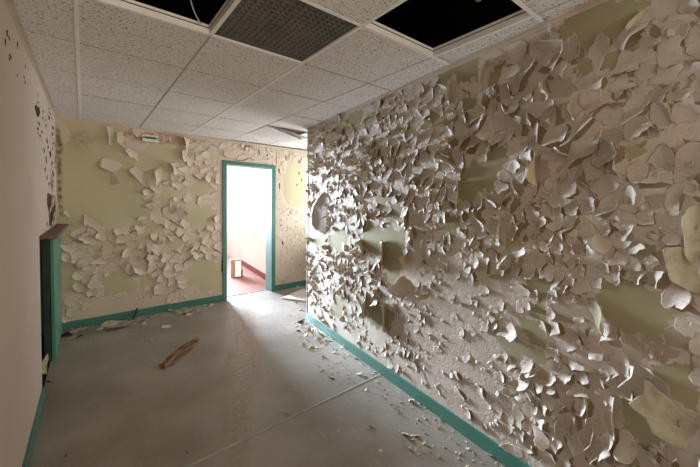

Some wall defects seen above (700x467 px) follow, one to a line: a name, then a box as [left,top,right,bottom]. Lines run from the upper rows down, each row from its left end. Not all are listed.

peeling [35,93,260,324]
peeling [264,0,700,467]